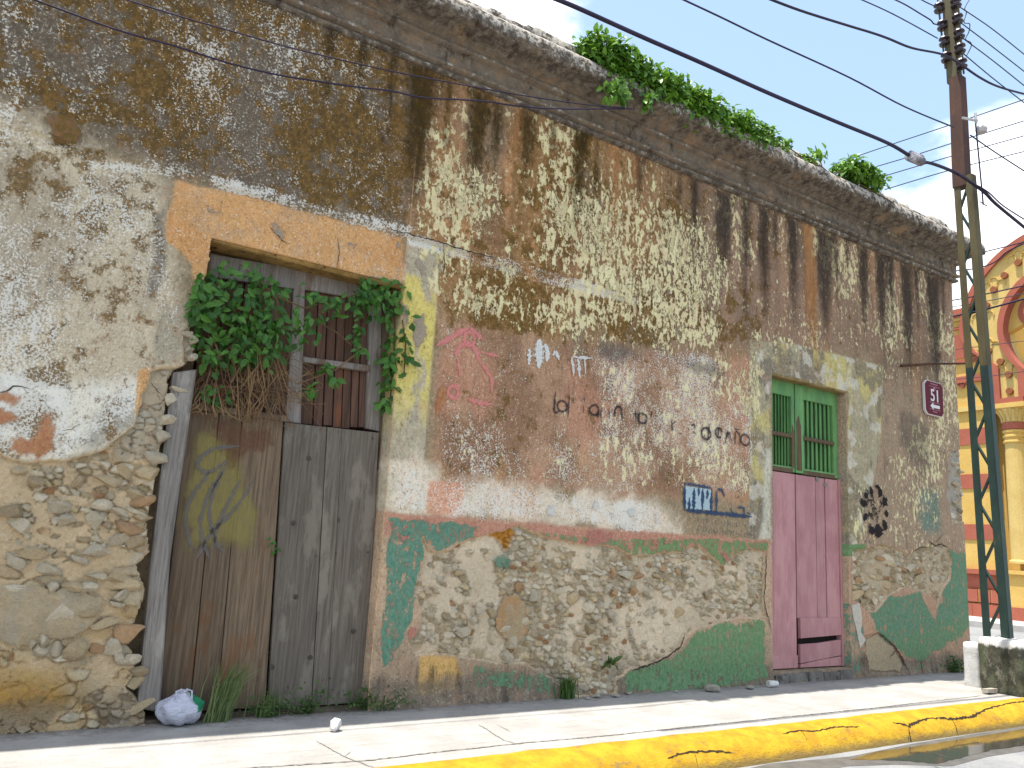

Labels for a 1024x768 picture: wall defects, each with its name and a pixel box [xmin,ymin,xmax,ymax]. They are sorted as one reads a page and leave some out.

peeling [429,153,513,230]
peeling [548,189,662,324]
peeling [657,211,727,324]
leakage [716,190,797,294]
leakage [817,229,944,378]
flaking render [0,369,188,735]
flaking render [399,526,764,695]
crack [633,633,685,671]
flaking render [851,545,949,672]
crack [668,750,731,766]
crack [786,726,858,734]
crack [893,701,1024,758]